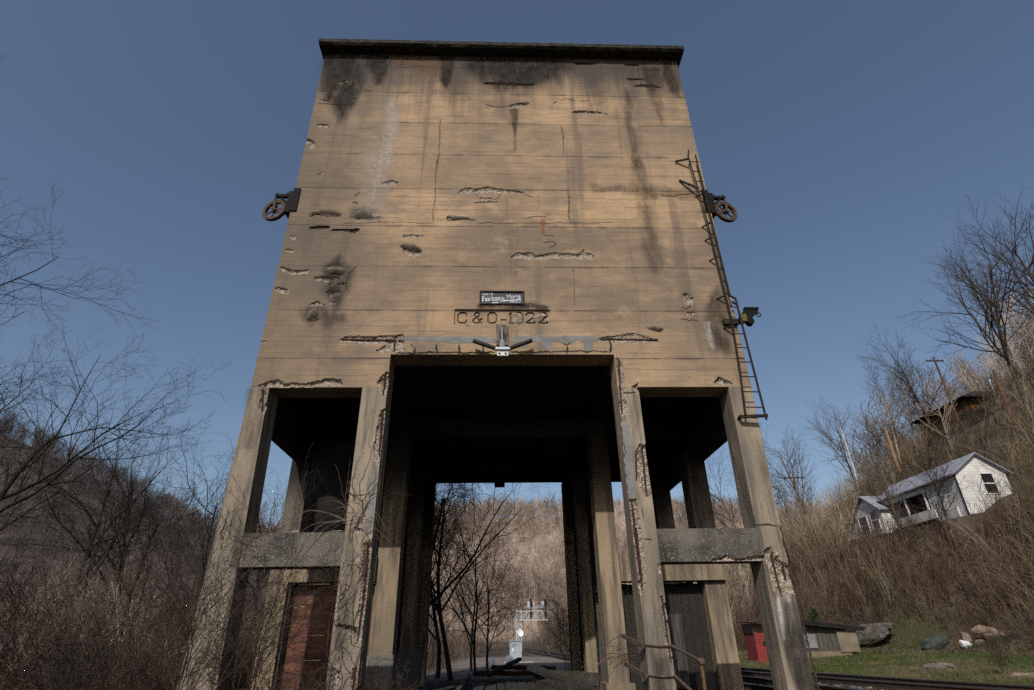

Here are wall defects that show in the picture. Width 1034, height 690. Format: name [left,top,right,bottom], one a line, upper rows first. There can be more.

damp [324,54,388,116]
damp [439,56,454,86]
damp [468,57,563,88]
crack [344,120,614,247]
spalling [457,186,532,203]
spalling [400,234,424,257]
spalling [510,249,595,260]
spalling [339,333,405,353]
spalling [599,333,659,344]
spalling [257,378,343,415]
spalling [615,356,639,416]